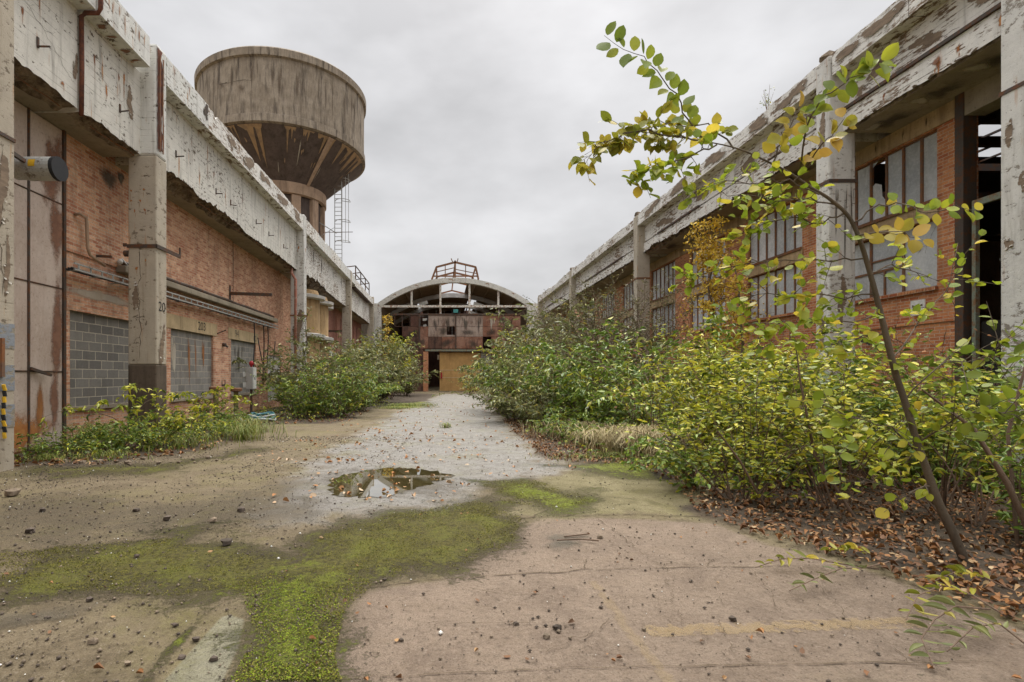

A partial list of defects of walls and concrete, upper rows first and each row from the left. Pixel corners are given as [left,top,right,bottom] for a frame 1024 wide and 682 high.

peeling [0,155,12,303]
corrosion [43,181,63,257]
spalling [14,57,140,157]
peeling [226,123,301,223]
peeling [835,0,906,63]
spalling [845,30,1001,132]
peeling [1003,119,1013,148]
corrosion [14,285,62,453]